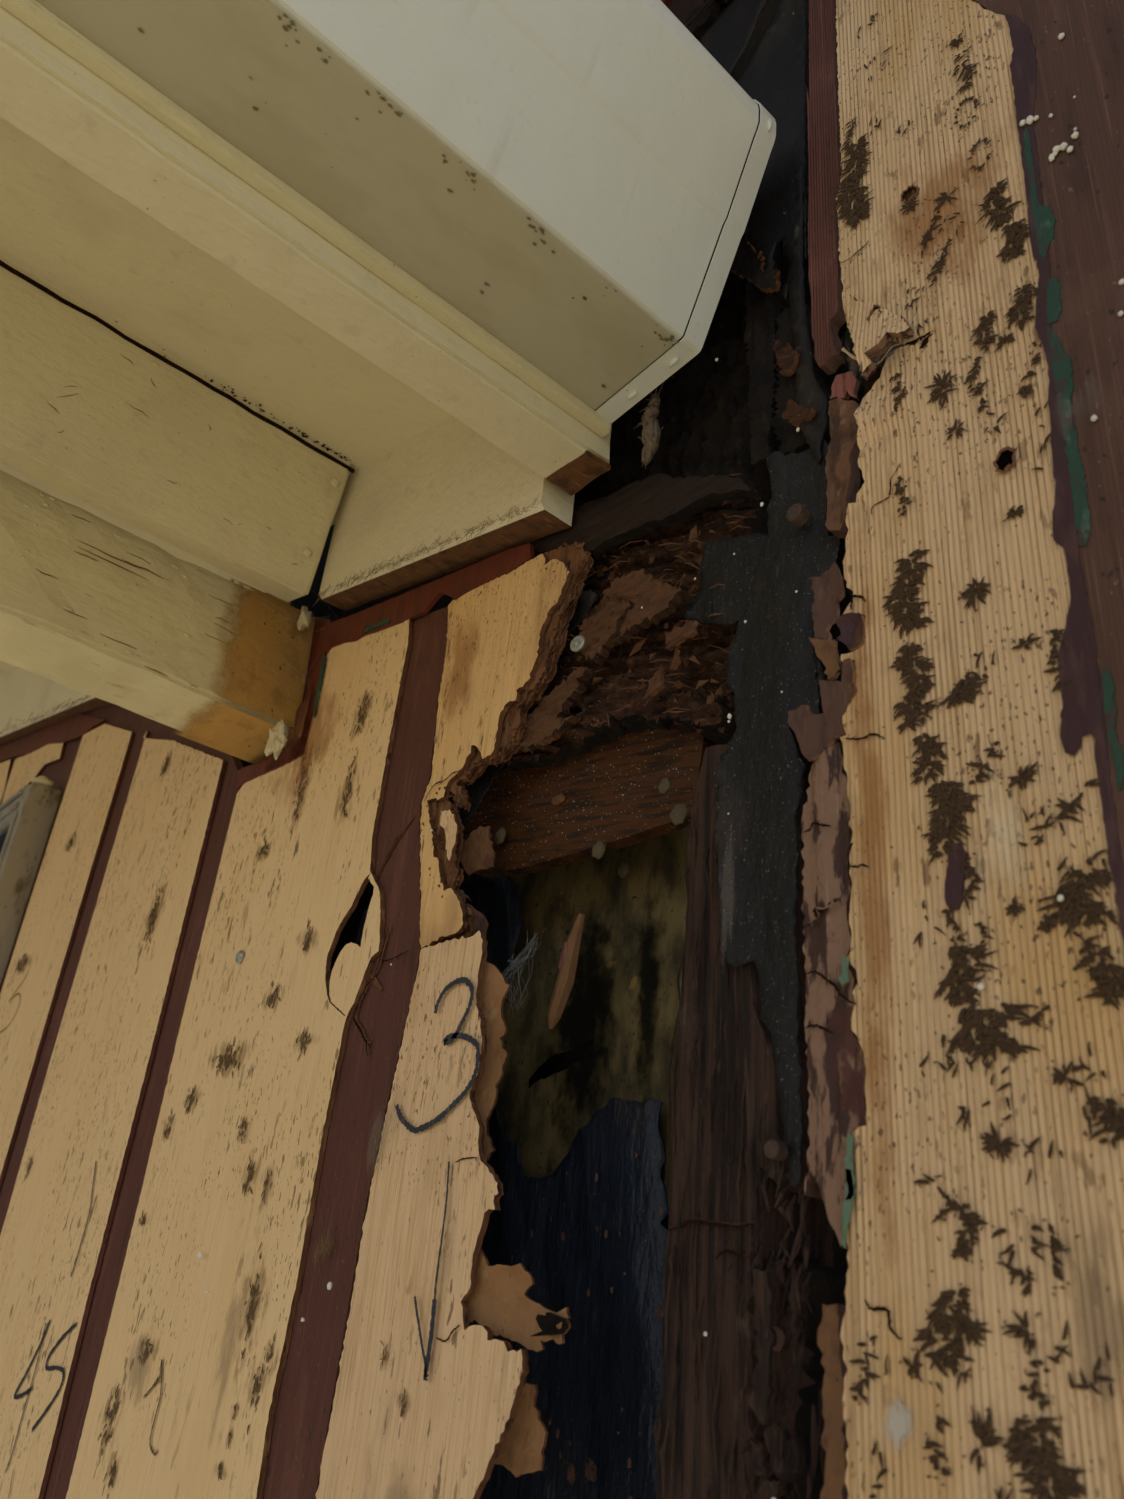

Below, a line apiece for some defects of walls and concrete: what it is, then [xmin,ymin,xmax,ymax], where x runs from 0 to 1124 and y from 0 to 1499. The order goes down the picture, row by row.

spalling [730,0,782,82]
spalling [803,0,811,307]
spalling [815,322,894,405]
spalling [290,524,487,621]
spalling [418,501,750,898]
peeling [787,517,866,802]
spalling [330,880,374,977]
water stain [548,916,615,1138]
water stain [636,902,659,1085]
spalling [832,1229,849,1270]